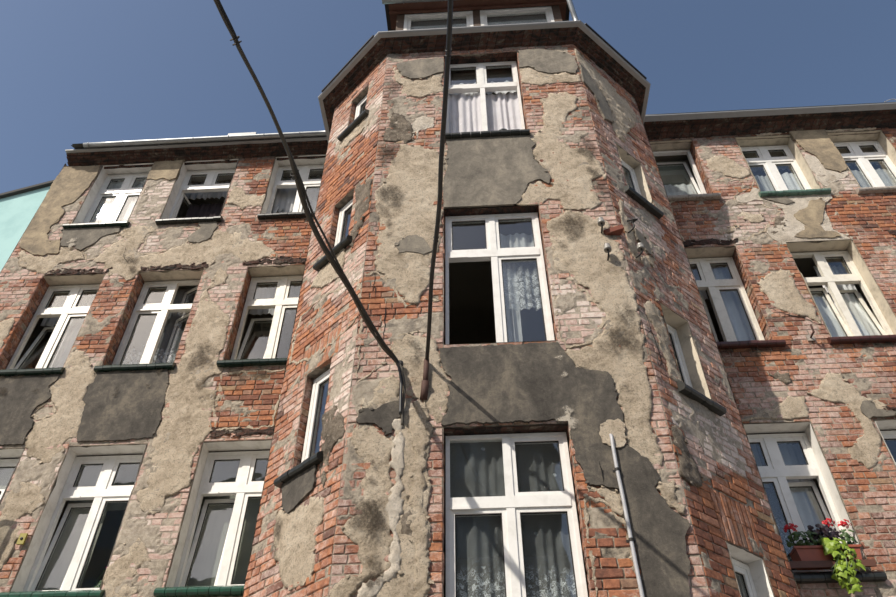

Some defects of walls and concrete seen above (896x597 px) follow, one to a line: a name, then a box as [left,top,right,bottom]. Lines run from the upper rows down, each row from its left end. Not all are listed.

peeling [706,127,876,244]
peeling [0,48,704,597]
peeling [757,267,822,324]
peeling [742,372,896,469]